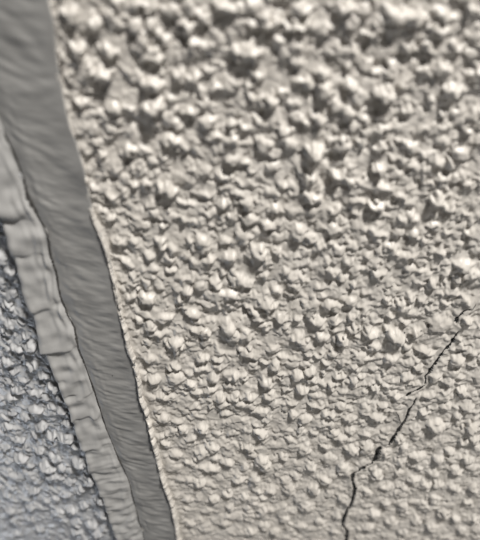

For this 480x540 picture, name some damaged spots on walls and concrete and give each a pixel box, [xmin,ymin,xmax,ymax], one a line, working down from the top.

crack [341,304,476,540]